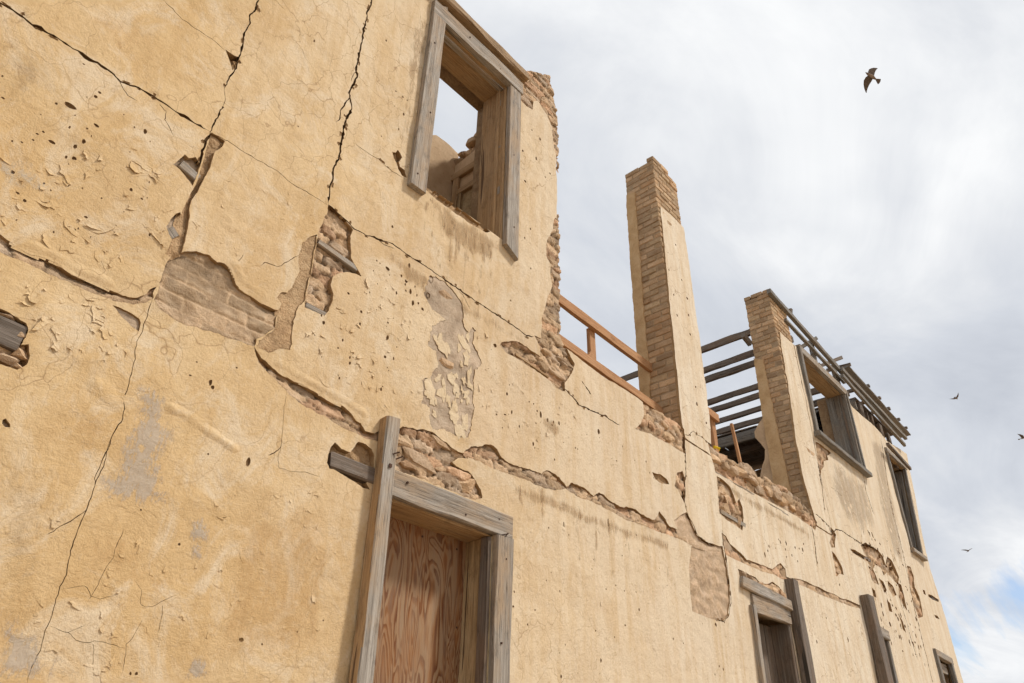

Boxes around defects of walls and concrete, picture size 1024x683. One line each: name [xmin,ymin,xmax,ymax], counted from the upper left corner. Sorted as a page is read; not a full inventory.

crack [0,0,534,339]
spalling [521,71,559,178]
spalling [0,135,379,466]
spalling [493,214,573,391]
crack [27,298,168,682]
crack [563,382,619,425]
spalling [369,260,860,627]
crack [810,465,875,564]
spalling [852,532,929,664]